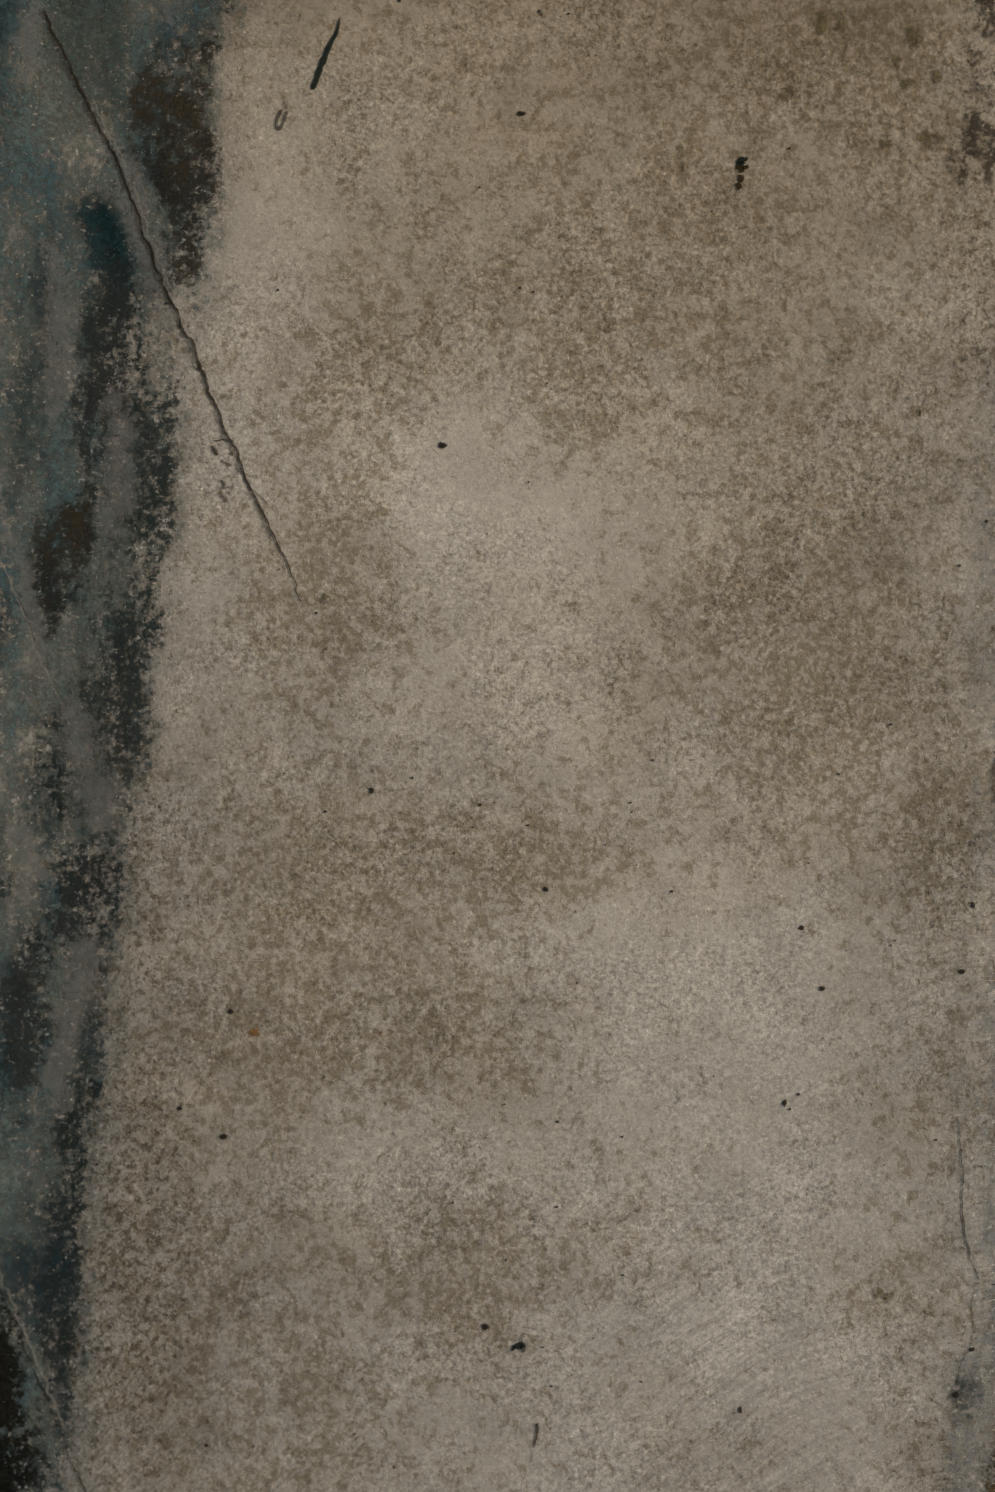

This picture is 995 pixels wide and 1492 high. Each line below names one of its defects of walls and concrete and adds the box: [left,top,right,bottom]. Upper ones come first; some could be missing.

crack [43,9,300,600]
damp [945,0,995,185]
damp [0,0,252,1492]
crack [956,1117,995,1408]